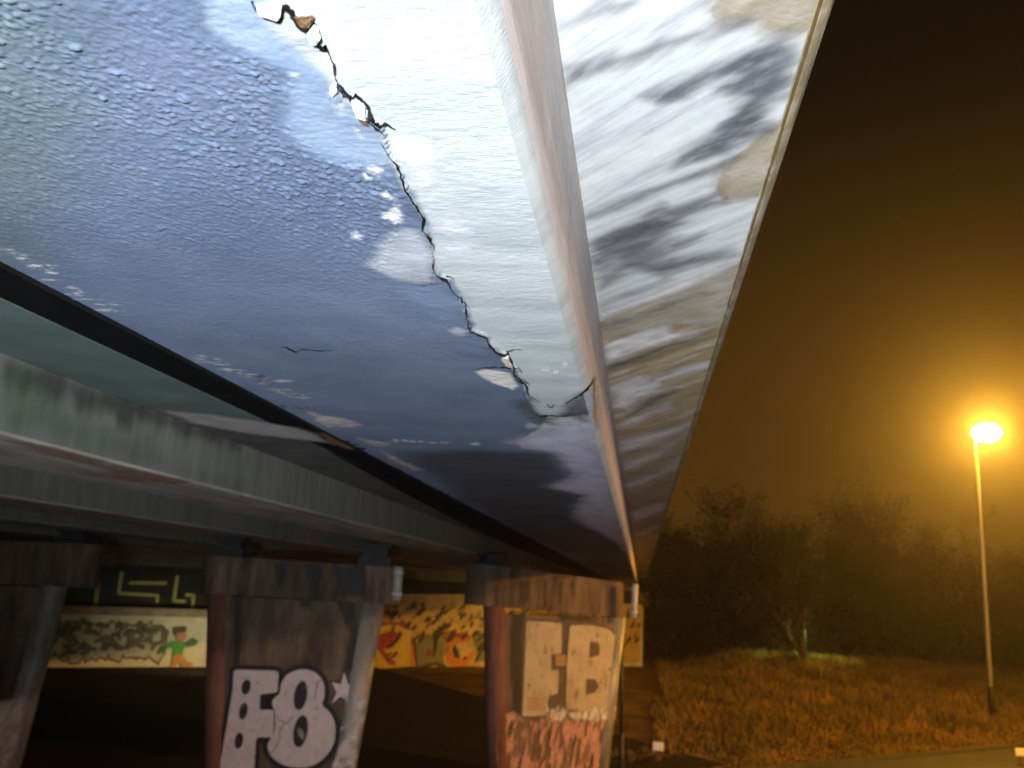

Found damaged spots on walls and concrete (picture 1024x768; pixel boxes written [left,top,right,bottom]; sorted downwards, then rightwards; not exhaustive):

crack [251,1,594,418]
spalling [476,370,518,390]